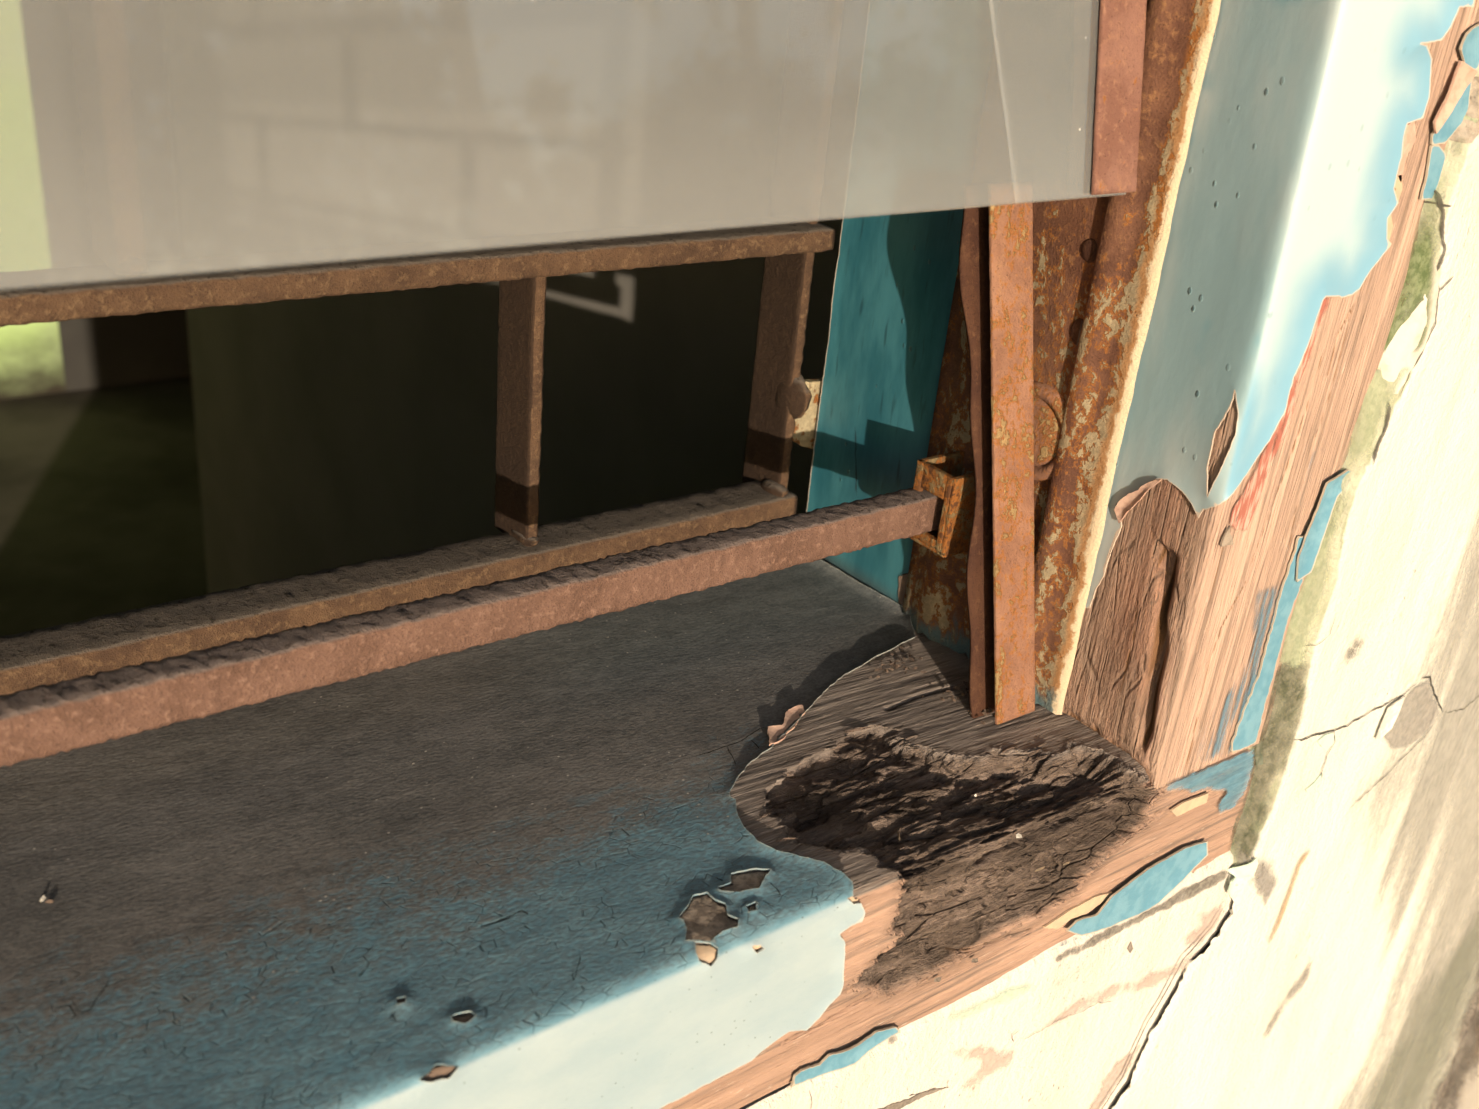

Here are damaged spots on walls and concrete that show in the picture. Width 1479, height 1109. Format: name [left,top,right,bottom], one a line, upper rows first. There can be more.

peeling [1387,23,1479,240]
peeling [1220,298,1329,547]
peeling [1114,480,1161,523]
peeling [1168,469,1351,816]
peeling [767,705,806,746]
crack [1300,676,1473,808]
water stain [1344,528,1479,1109]
peeling [680,872,769,965]
peeling [1042,840,1208,936]
peeling [1188,858,1258,943]
peeling [790,1026,901,1088]
spalling [879,1087,949,1109]